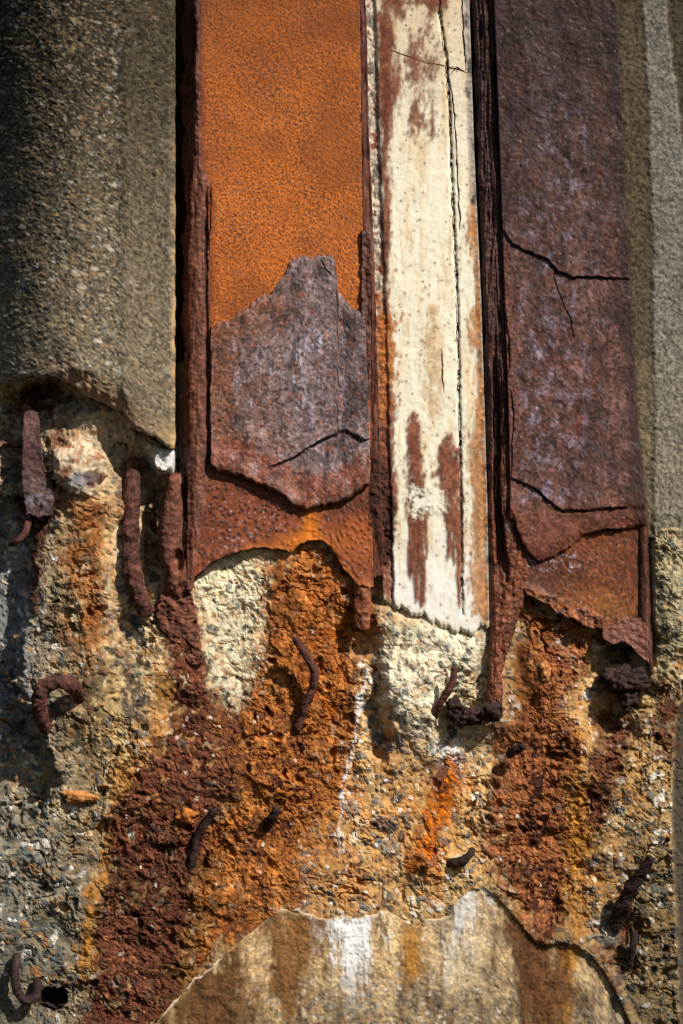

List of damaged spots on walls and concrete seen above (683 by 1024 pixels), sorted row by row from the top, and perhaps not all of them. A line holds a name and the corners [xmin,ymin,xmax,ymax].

corrosion [210,0,488,624]
crack [373,0,628,614]
spalling [59,400,155,617]
crack [268,429,370,467]
spalling [192,553,269,712]
spalling [378,617,487,742]
spalling [651,531,683,665]
corrosion [79,540,382,1024]
corrosion [405,756,463,875]
spalling [446,847,476,868]
corrosion [481,588,649,1024]
corrosion [405,926,419,984]